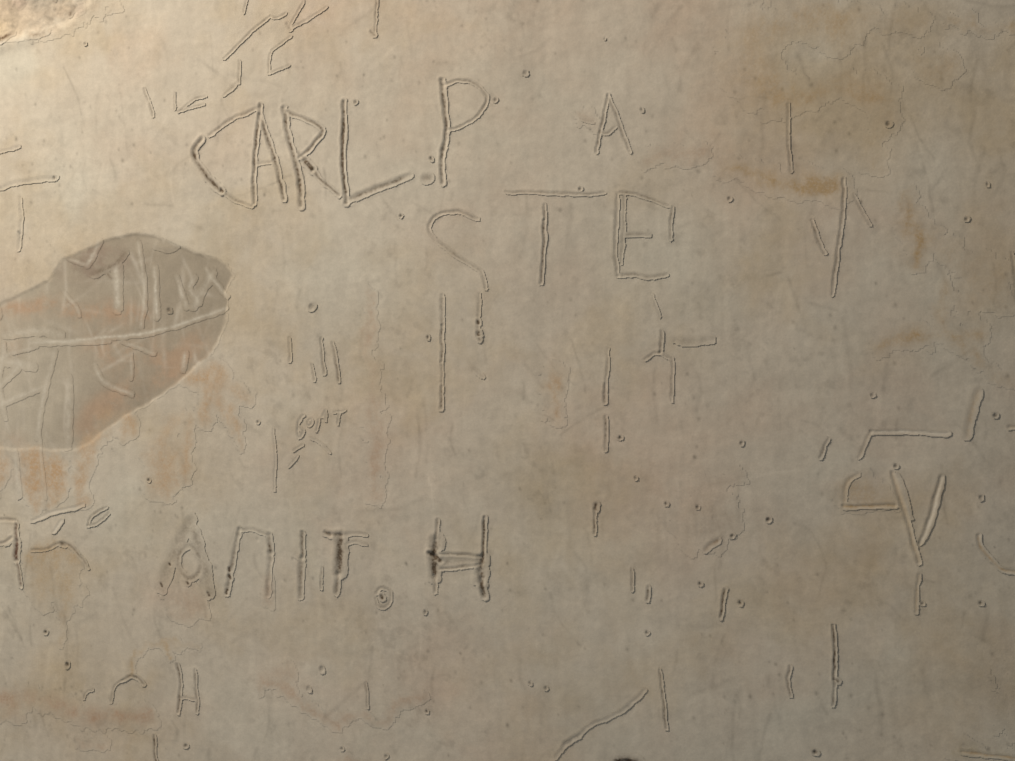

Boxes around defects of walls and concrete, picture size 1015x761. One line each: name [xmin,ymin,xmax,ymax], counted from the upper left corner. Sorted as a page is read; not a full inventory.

flaking render [0,0,124,45]
flaking render [607,751,646,761]